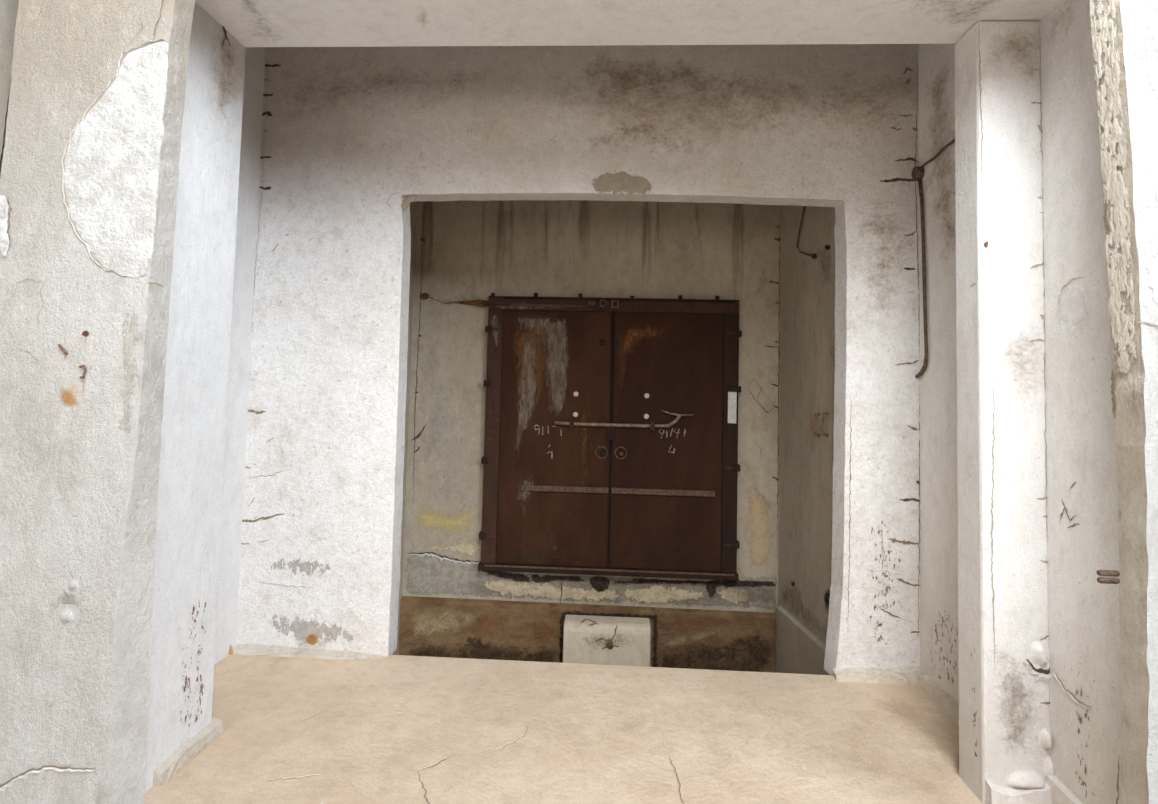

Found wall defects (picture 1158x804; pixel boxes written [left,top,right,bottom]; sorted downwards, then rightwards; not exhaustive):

flaking render [61,39,168,278]
peeling [1089,0,1137,419]
crack [0,765,95,793]
crack [417,754,454,804]
crack [669,757,685,804]